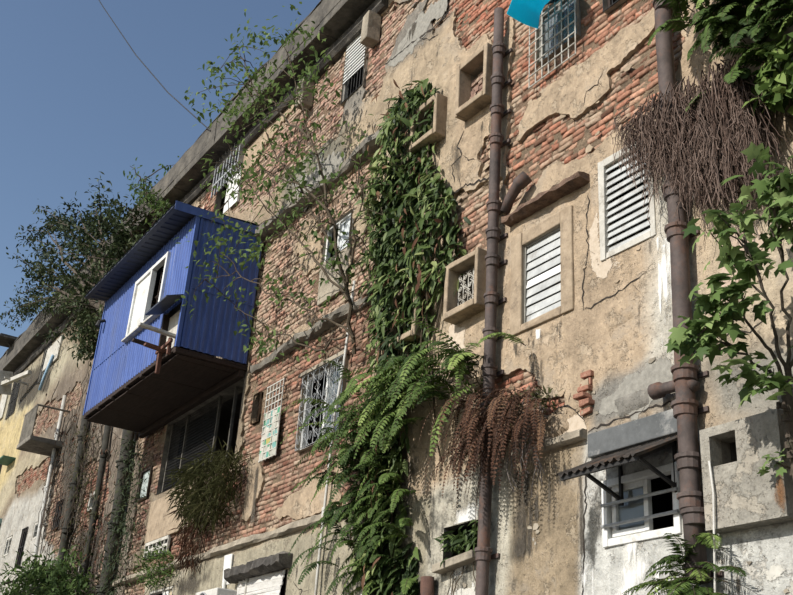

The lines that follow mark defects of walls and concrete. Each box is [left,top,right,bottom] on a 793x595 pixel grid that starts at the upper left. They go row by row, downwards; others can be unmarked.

flaking render [233,55,345,214]
crack [451,131,489,199]
flaking render [452,137,490,260]
flaking render [362,0,659,215]
flaking render [583,213,620,283]
crack [582,196,647,309]
flaking render [125,152,378,595]
flaking render [495,369,587,437]
flaking render [591,357,673,421]
damp [512,475,538,559]
crack [582,456,590,594]
damp [579,476,600,556]